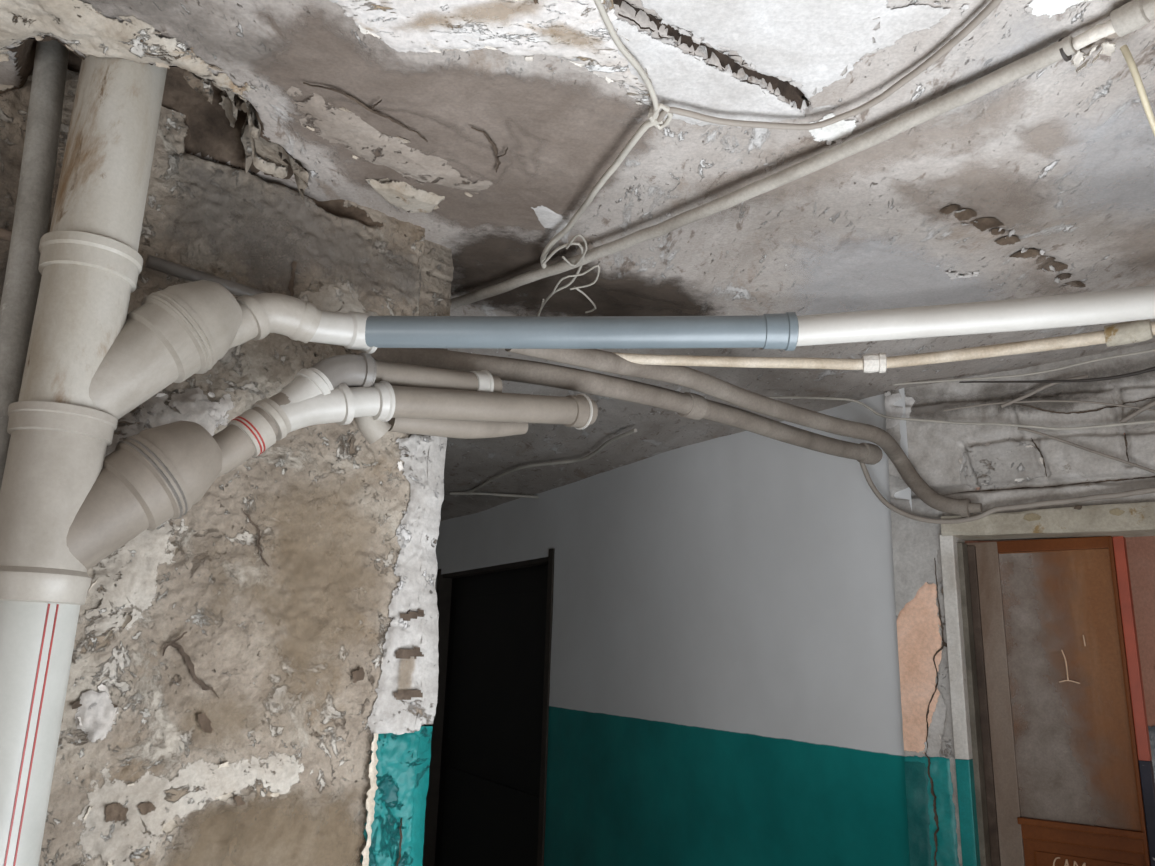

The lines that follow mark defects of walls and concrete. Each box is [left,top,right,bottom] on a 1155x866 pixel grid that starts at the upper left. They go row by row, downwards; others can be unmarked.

spalling [0,0,309,200]
damp [462,4,533,20]
crack [613,0,811,109]
damp [854,2,970,62]
damp [254,11,712,316]
spalling [939,204,1086,288]
peeling [889,474,943,754]
spalling [399,657,415,689]
crack [925,558,947,866]